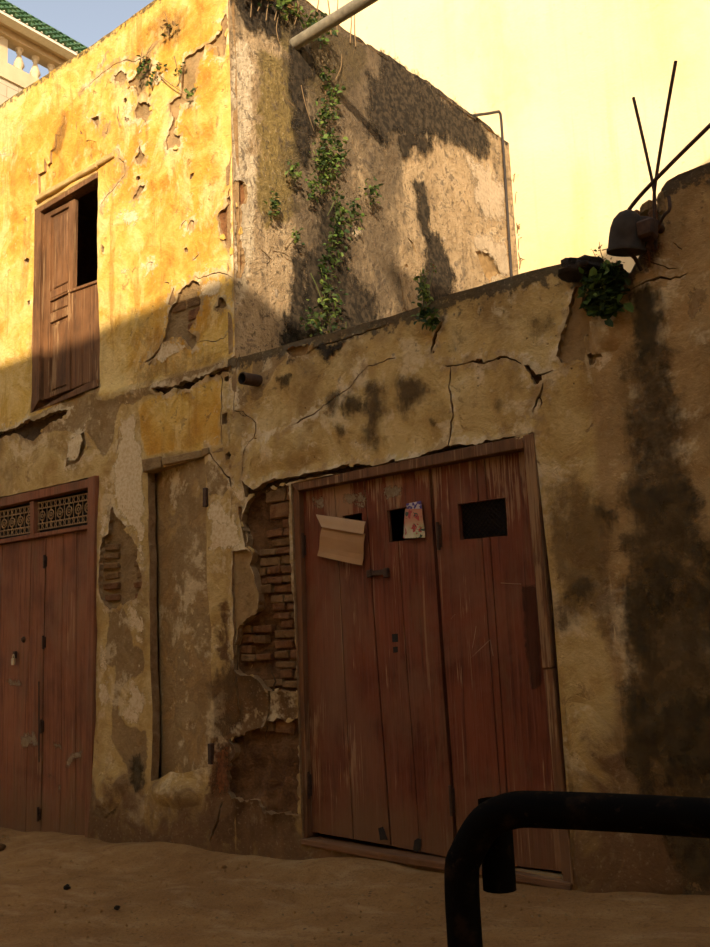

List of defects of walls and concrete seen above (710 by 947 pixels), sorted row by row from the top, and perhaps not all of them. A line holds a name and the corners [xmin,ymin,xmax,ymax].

flaking render [115,24,228,150]
damp [365,49,510,277]
damp [413,178,457,304]
flaking render [0,411,67,441]
peeling [67,433,87,465]
flaking render [157,280,227,363]
crack [432,325,545,406]
flaking render [100,414,145,643]
flaking render [207,462,372,692]
damp [553,483,617,635]
damp [620,285,710,798]
damp [664,835,710,896]